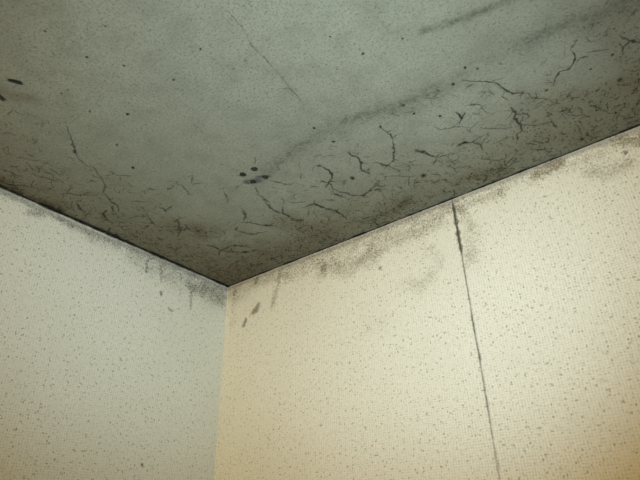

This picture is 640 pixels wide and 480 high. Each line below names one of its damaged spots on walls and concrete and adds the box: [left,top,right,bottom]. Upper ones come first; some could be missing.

crack [0,81,640,287]
water stain [180,44,640,285]